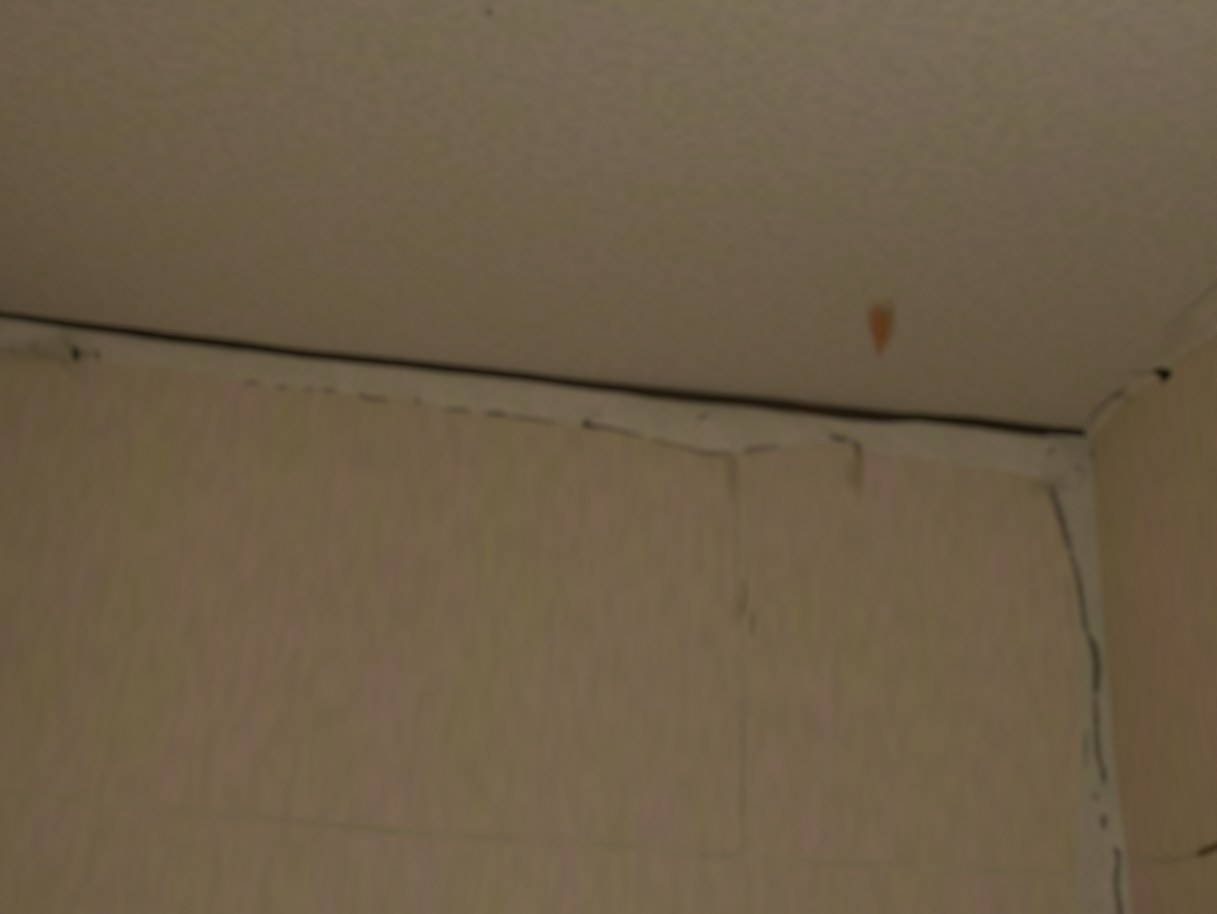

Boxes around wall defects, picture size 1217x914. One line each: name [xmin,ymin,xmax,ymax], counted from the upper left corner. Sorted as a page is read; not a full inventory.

crack [0,312,1086,440]